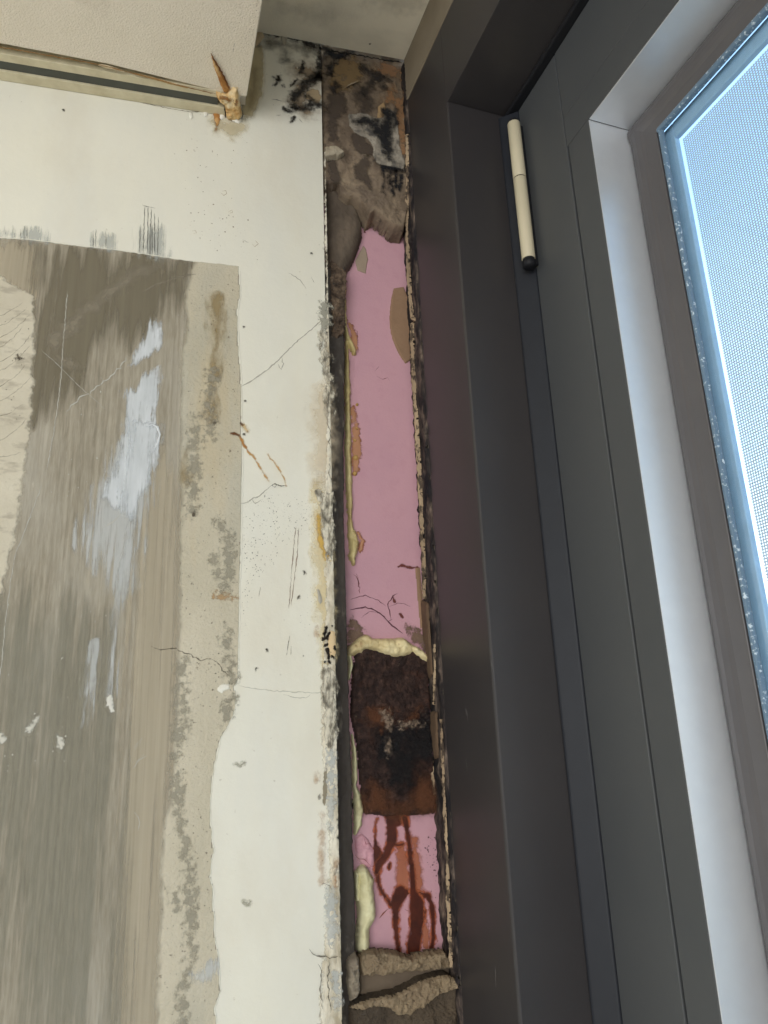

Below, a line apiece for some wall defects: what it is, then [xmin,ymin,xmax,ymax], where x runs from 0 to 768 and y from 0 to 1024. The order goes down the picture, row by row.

leakage [213,33,406,196]
peeling [348,102,405,170]
peeling [0,237,244,1024]
crack [351,595,408,633]
rust [365,780,437,955]